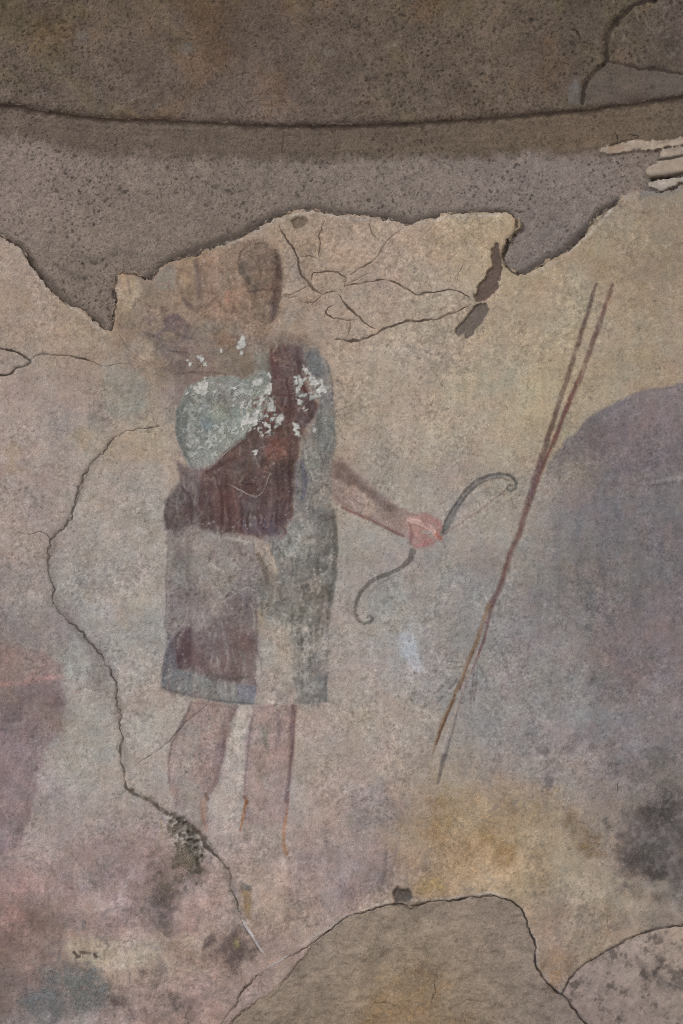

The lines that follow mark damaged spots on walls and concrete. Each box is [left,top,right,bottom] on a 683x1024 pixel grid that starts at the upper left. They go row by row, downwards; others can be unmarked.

crack [111,208,526,343]
flaking render [0,135,683,339]
crack [0,348,30,376]
peeling [183,356,300,460]
peeling [293,367,329,411]
crack [47,427,154,599]
crack [70,623,160,809]
crack [189,825,219,858]